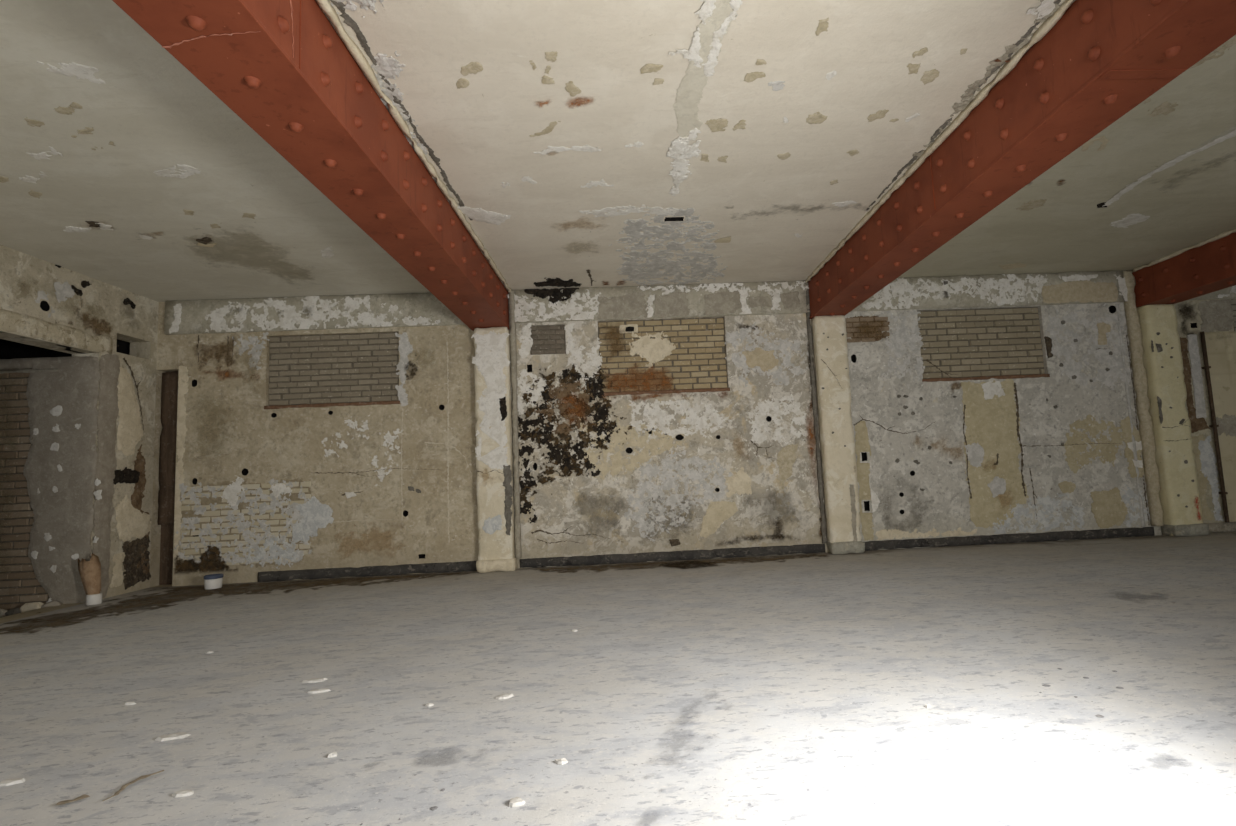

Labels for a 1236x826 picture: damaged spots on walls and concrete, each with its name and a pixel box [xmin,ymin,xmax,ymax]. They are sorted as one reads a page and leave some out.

peeling [640,64,664,85]
spalling [831,0,1061,211]
crack [1103,129,1236,206]
peeling [169,303,182,334]
peeling [173,366,334,570]
peeling [205,295,440,406]
peeling [321,409,403,486]
mould [512,364,632,524]
peeling [471,205,810,546]
peeling [823,274,1098,416]
peeling [844,379,1150,542]
peeling [1151,322,1236,521]